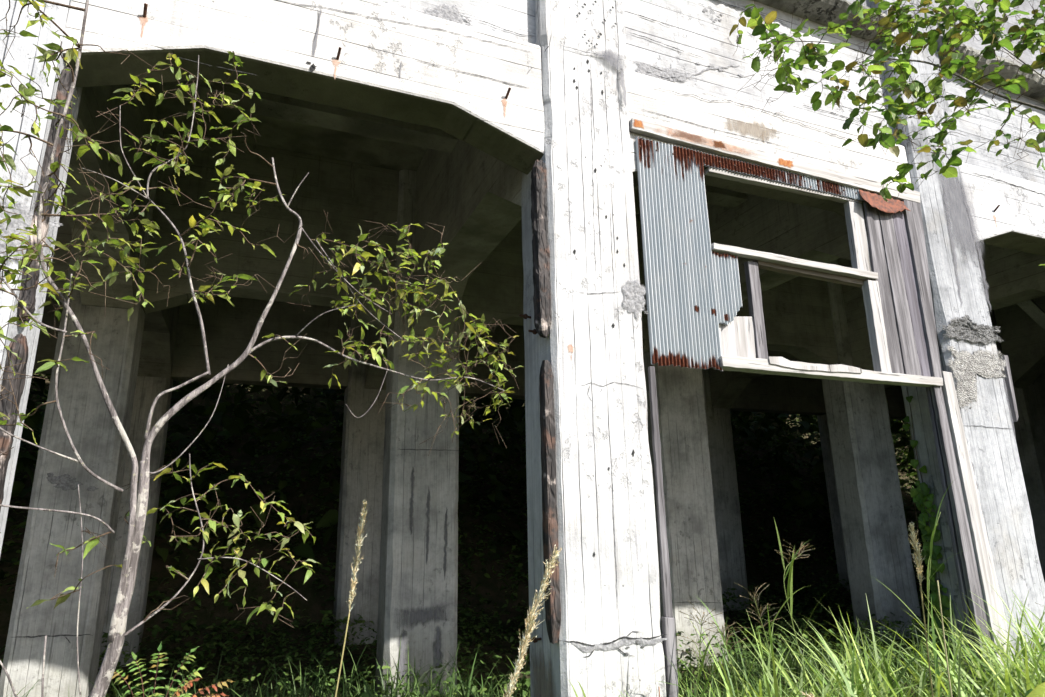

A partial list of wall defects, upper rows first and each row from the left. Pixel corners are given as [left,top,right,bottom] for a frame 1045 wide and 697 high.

rust [634,119,845,196]
rust [859,189,910,213]
crack [593,189,615,292]
spalling [573,280,648,318]
rust [652,348,722,371]
spalling [942,315,1006,410]
crack [611,517,619,594]
crack [558,631,667,657]